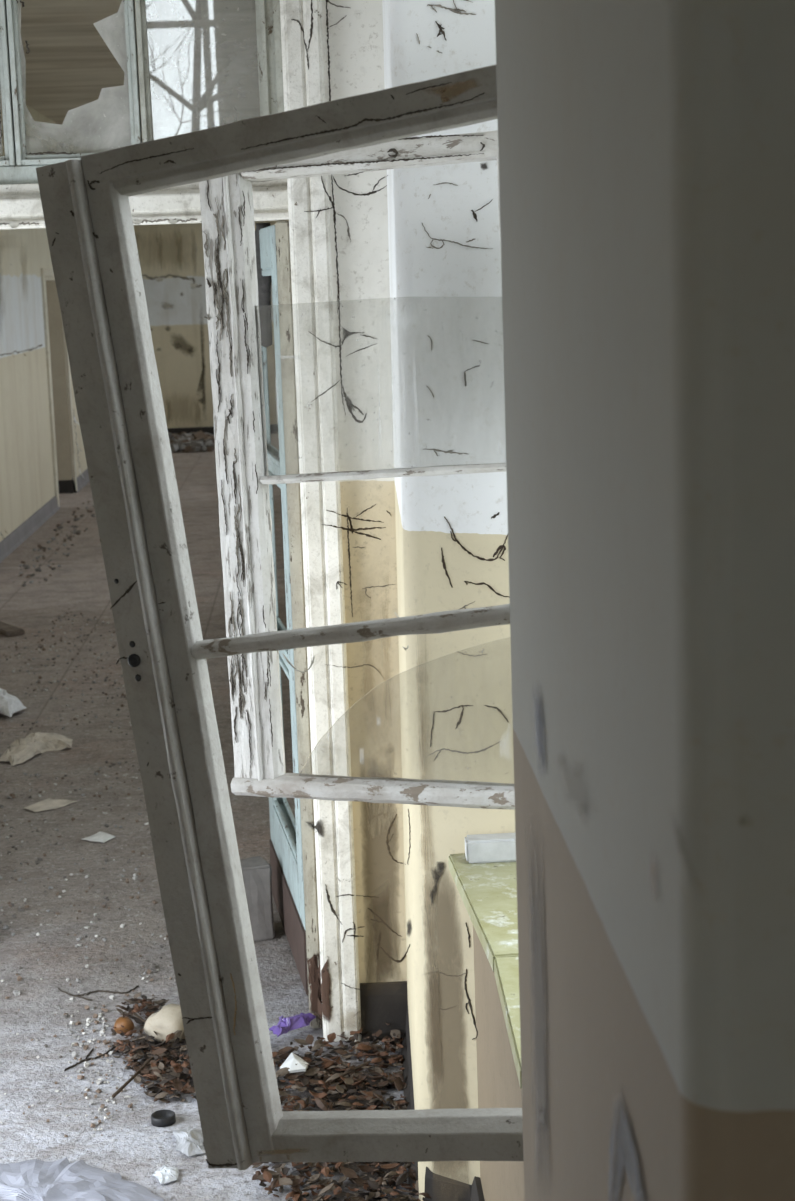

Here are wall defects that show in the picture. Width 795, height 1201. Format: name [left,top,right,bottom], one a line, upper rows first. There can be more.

crack [203,0,493,768]
crack [441,512,509,610]
crack [430,705,508,760]
peeling [307,953,332,1021]